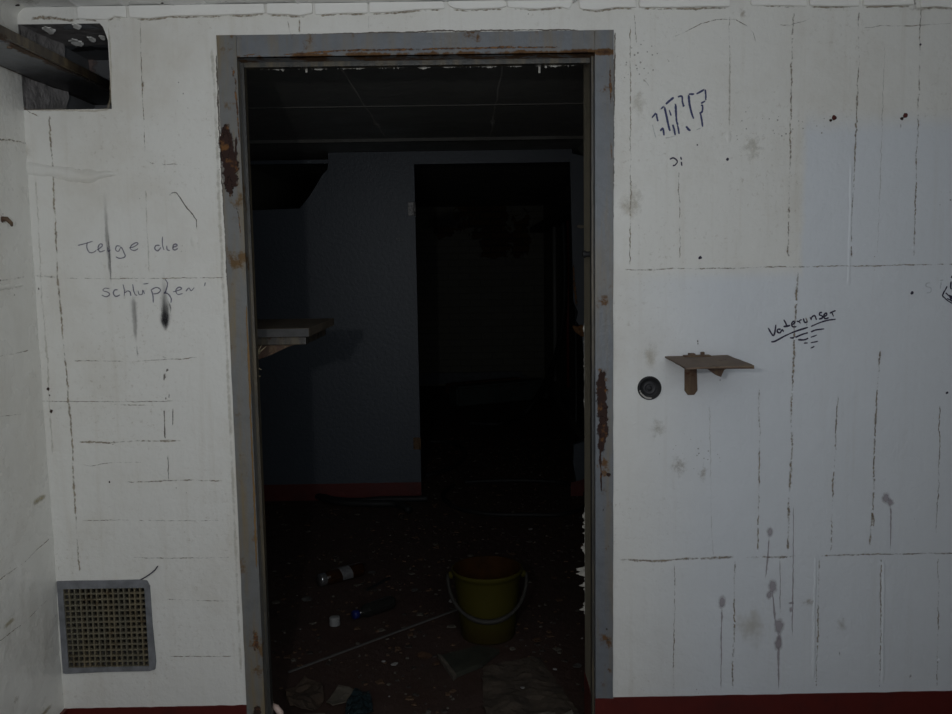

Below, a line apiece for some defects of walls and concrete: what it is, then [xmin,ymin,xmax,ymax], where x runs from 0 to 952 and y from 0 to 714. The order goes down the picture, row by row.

rust [218,69,240,197]
rust [595,370,611,491]
peeling [576,507,585,590]